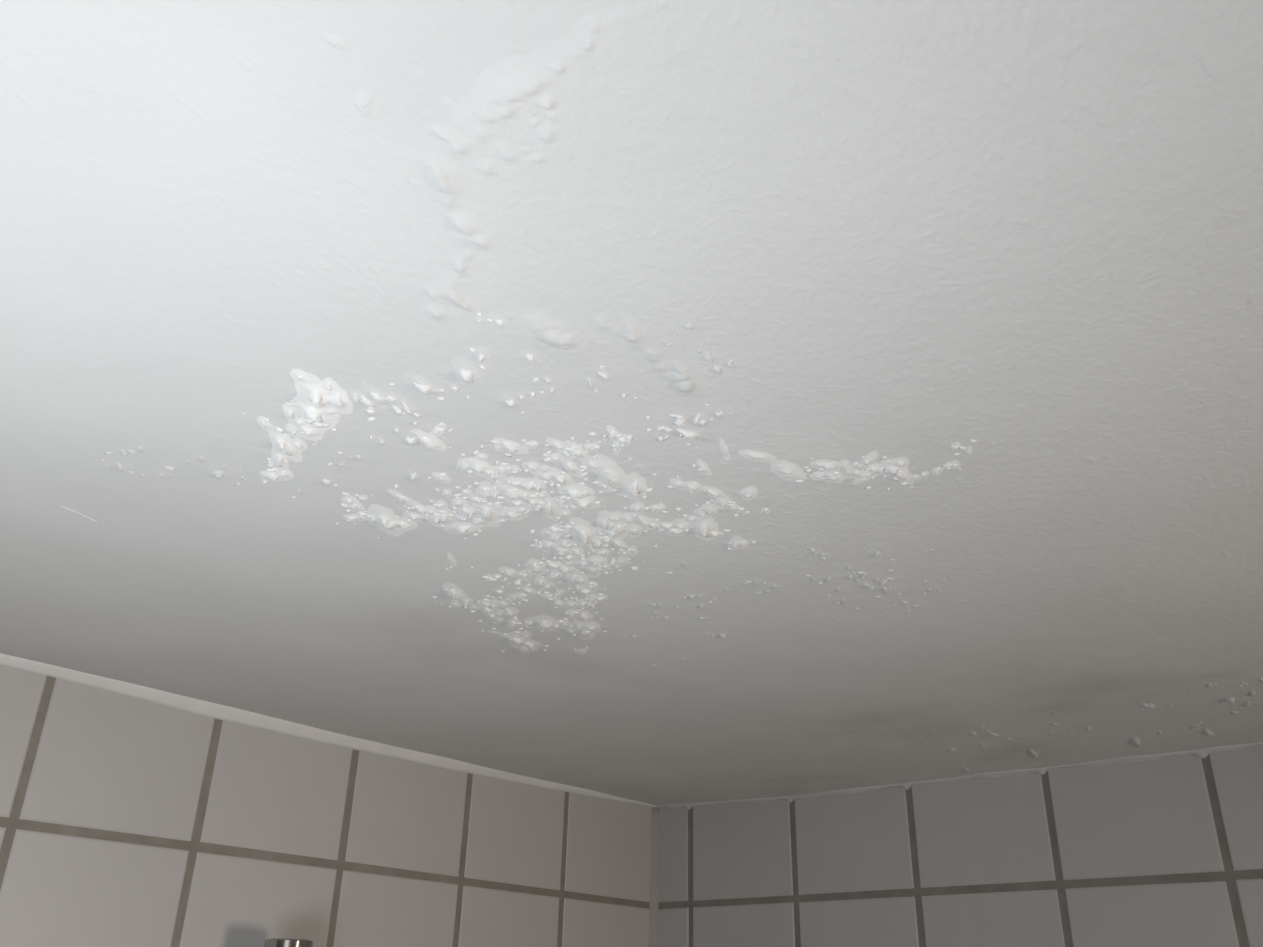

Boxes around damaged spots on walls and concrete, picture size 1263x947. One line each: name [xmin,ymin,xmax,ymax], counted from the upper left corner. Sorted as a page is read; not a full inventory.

peeling [242,368,354,484]
peeling [719,439,977,491]
peeling [335,422,770,655]